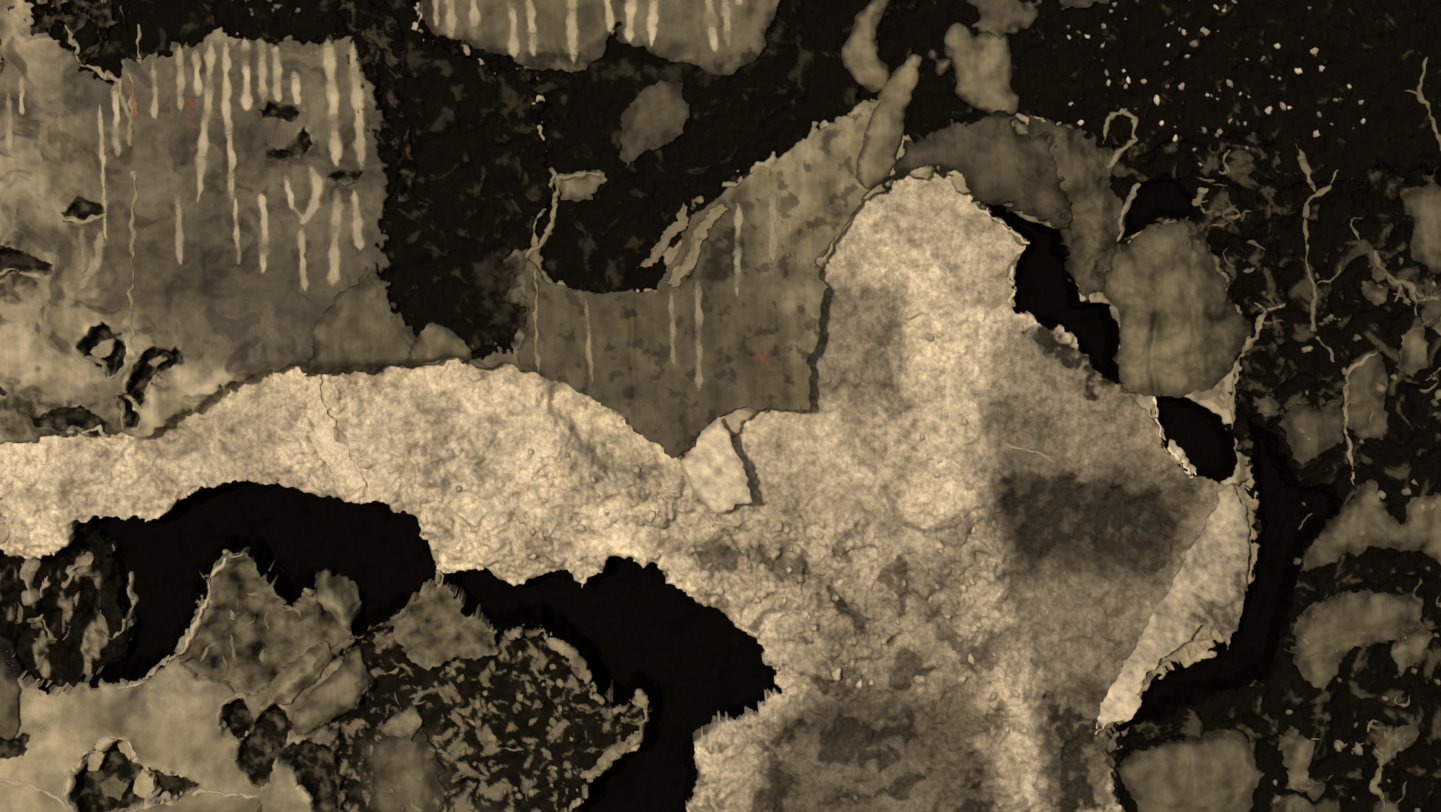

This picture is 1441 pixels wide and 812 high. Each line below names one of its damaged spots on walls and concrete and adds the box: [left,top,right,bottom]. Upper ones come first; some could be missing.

damp [79,90,120,289]
damp [176,39,301,247]
damp [285,168,364,291]
damp [323,43,365,166]
peeling [23,0,879,376]
damp [433,0,480,38]
damp [508,0,689,80]
peeling [875,0,990,143]
peeling [1005,0,1441,524]
spalling [0,100,1224,812]
peeling [1068,474,1441,812]
crack [0,736,262,812]